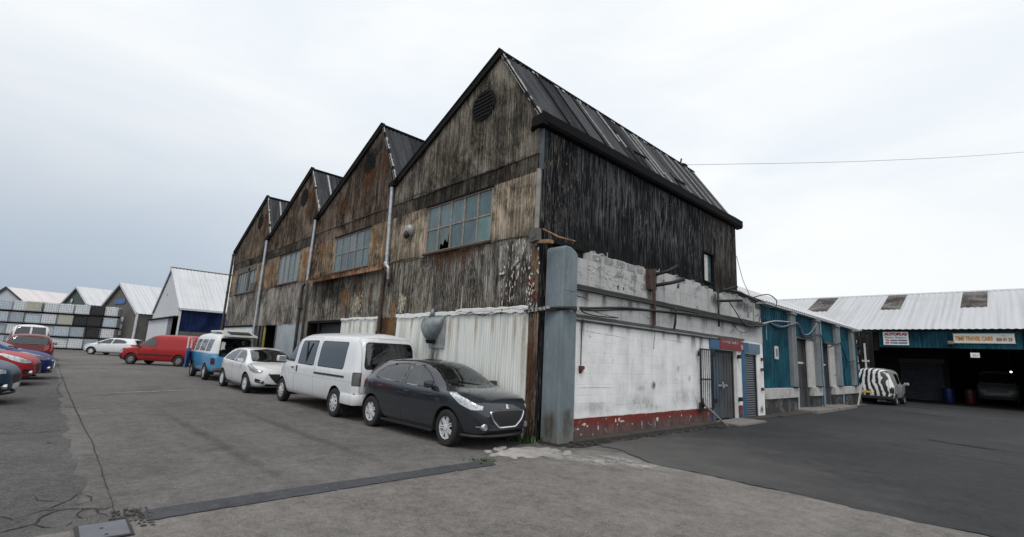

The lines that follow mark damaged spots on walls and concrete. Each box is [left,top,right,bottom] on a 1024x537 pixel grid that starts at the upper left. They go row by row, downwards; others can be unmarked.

peeling [499,238,540,314]
crack [0,362,116,533]